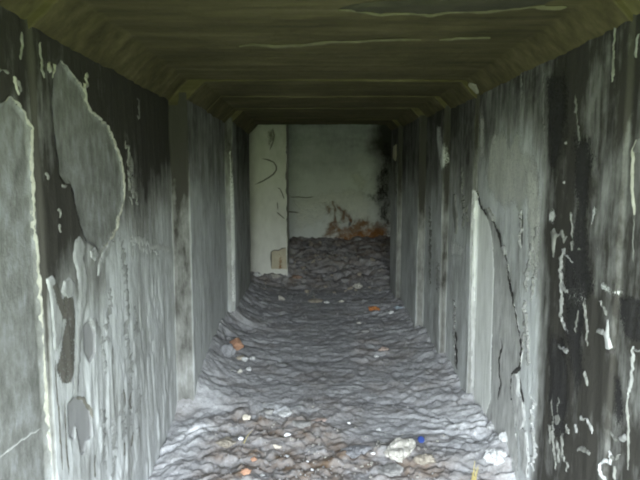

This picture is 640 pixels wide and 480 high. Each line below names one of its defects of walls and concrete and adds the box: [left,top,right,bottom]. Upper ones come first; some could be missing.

flaking render [0,42,142,480]
water stain [292,143,391,236]
corrosion [323,201,391,240]
peeling [549,209,616,354]
water stain [542,70,640,439]
peeling [548,398,593,472]
peeling [598,346,640,480]